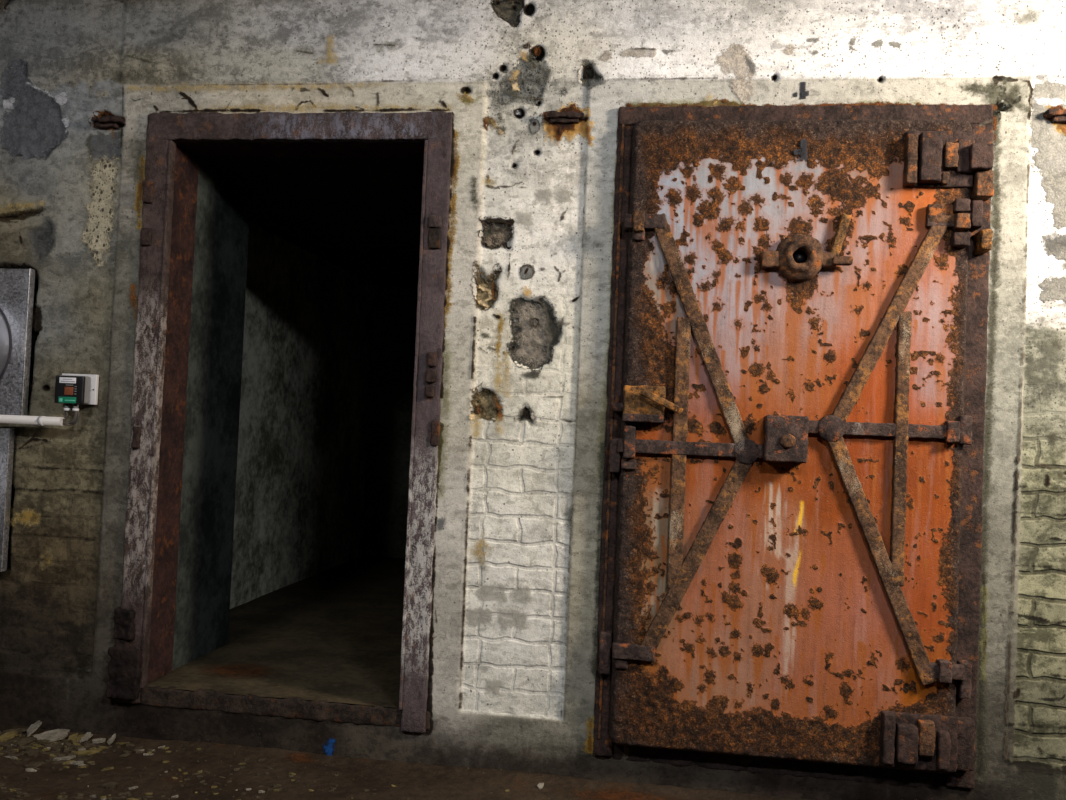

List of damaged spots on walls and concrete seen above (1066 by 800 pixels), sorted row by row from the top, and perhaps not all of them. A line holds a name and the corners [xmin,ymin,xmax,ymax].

flaking render [490,0,525,27]
peeling [0,58,73,160]
spalling [483,42,568,134]
corrosion [541,102,595,150]
corrosion [626,96,997,110]
corrosion [1043,105,1066,135]
flaking render [82,156,119,267]
flaking render [470,189,571,311]
peeling [1029,81,1066,306]
flaking render [469,383,503,436]